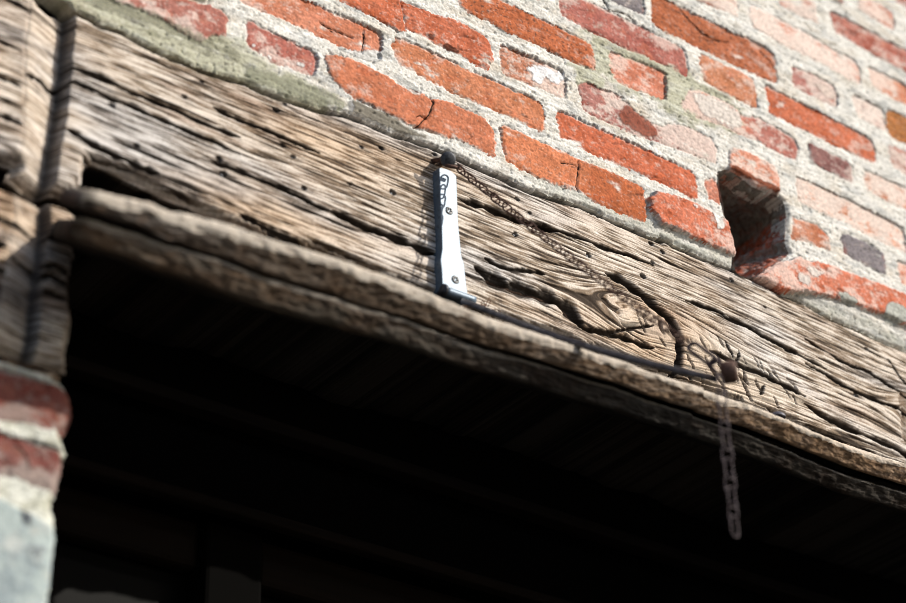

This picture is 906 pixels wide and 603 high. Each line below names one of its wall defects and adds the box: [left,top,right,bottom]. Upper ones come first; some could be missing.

spalling [717,165,788,281]